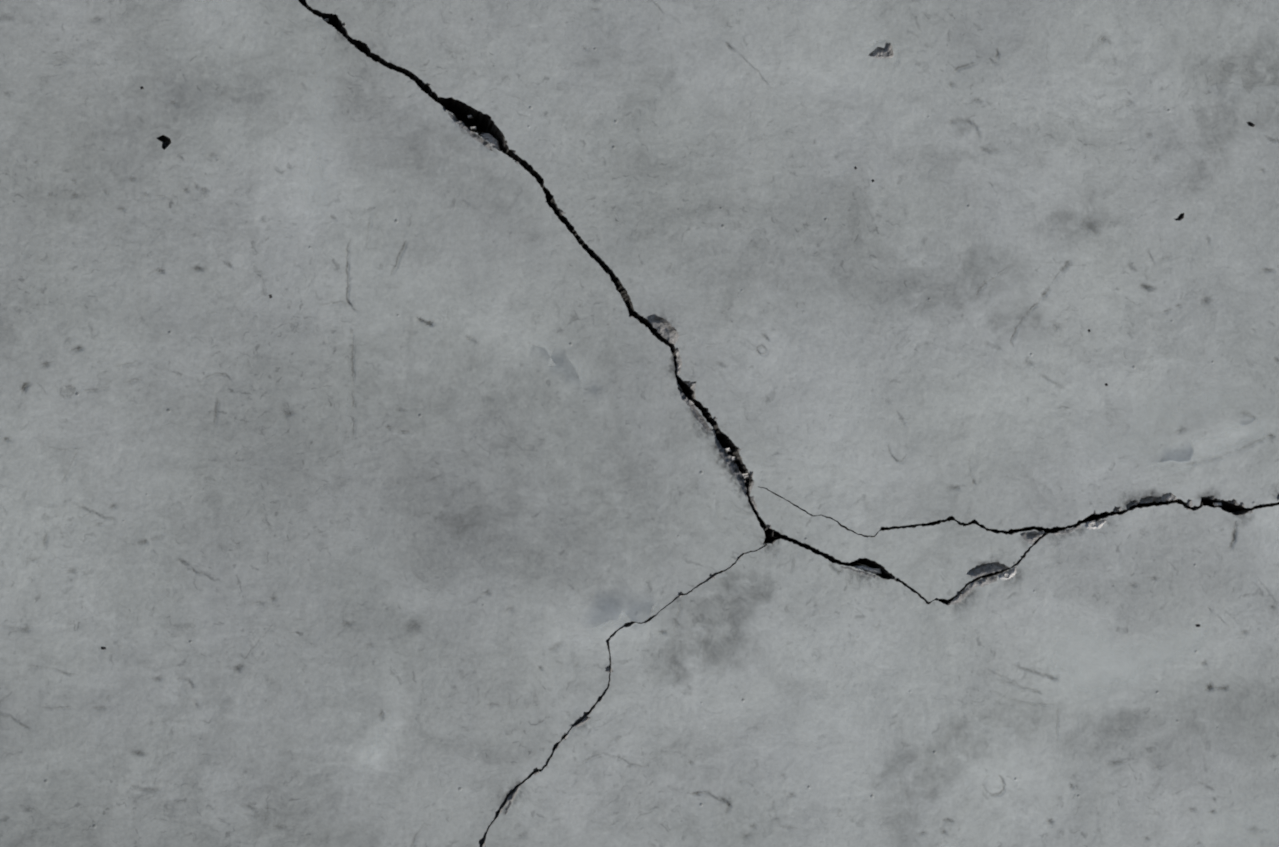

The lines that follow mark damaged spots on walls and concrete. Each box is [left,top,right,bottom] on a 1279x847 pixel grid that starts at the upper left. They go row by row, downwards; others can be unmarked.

crack [298,0,1279,847]